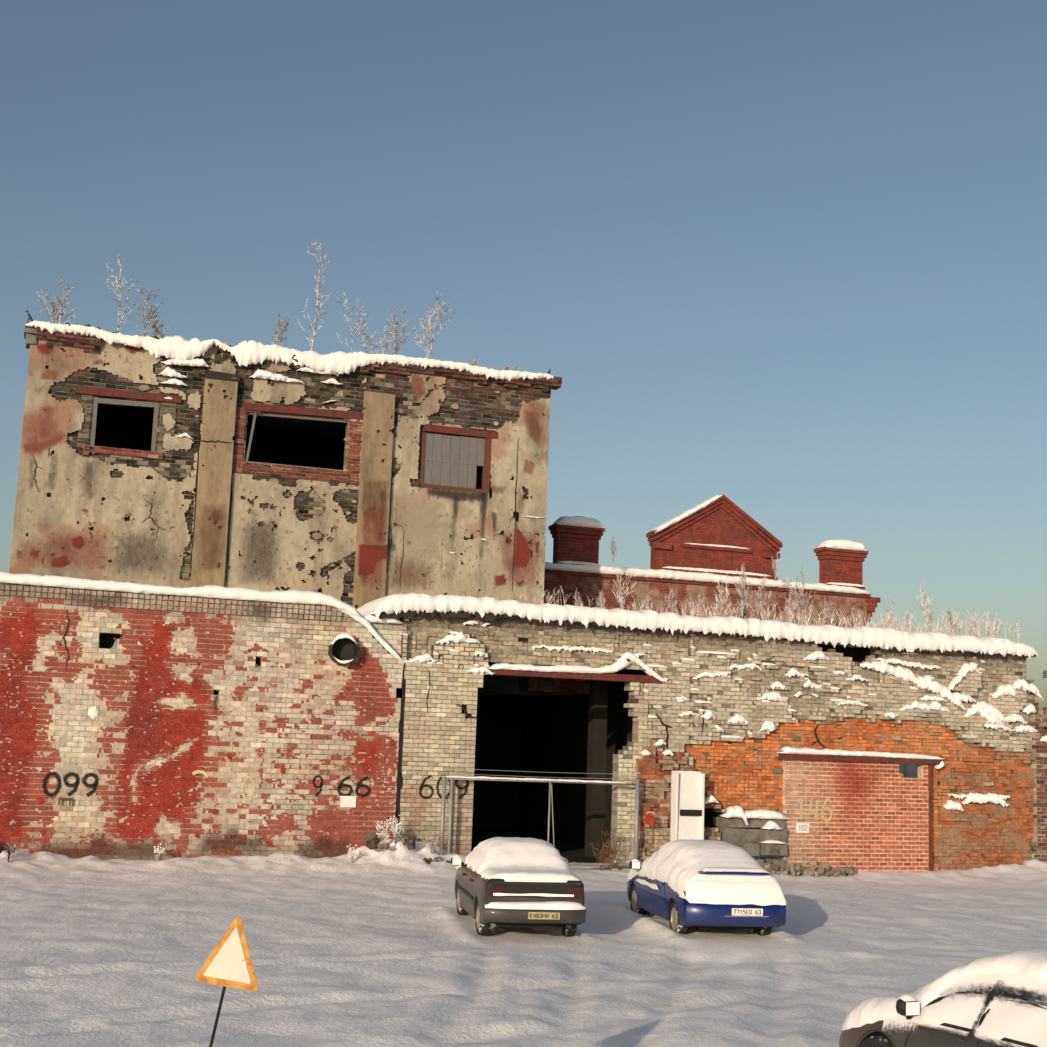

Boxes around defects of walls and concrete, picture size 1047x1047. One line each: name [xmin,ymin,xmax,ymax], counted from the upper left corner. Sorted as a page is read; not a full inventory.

flaking render [25,356,214,581]
flaking render [234,359,551,608]
crack [57,610,69,670]
peeling [0,596,405,860]
crack [811,724,825,749]